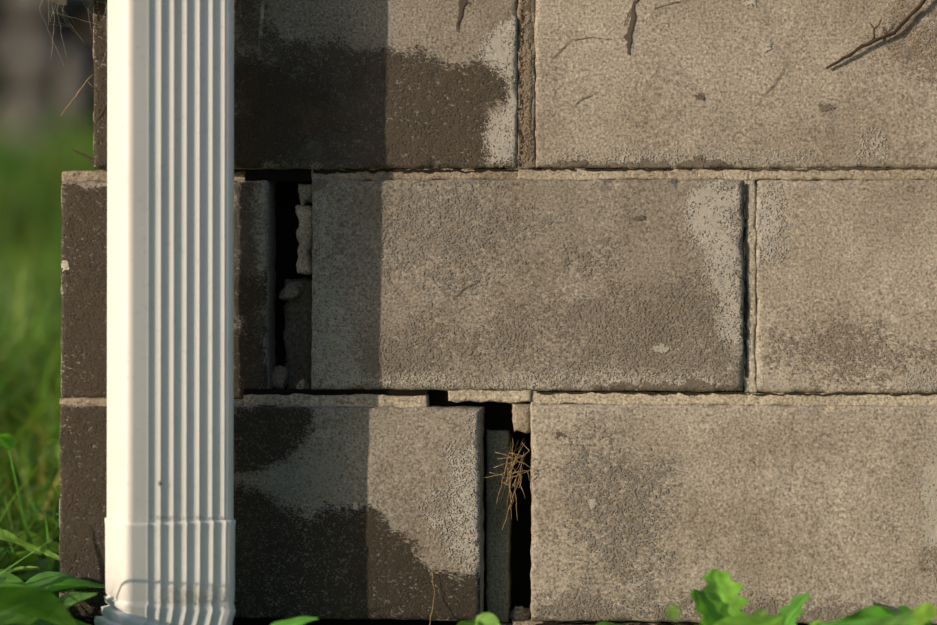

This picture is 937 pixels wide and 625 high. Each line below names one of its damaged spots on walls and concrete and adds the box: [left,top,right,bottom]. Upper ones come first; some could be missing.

water stain [234,0,517,168]
water stain [847,0,937,89]
water stain [234,182,480,620]
water stain [312,180,743,391]
crack [244,0,937,625]
water stain [547,143,812,168]
water stain [756,183,792,267]
water stain [756,298,937,393]
water stain [531,409,702,622]
water stain [916,449,937,591]
crack [73,617,95,625]
crack [232,617,281,625]